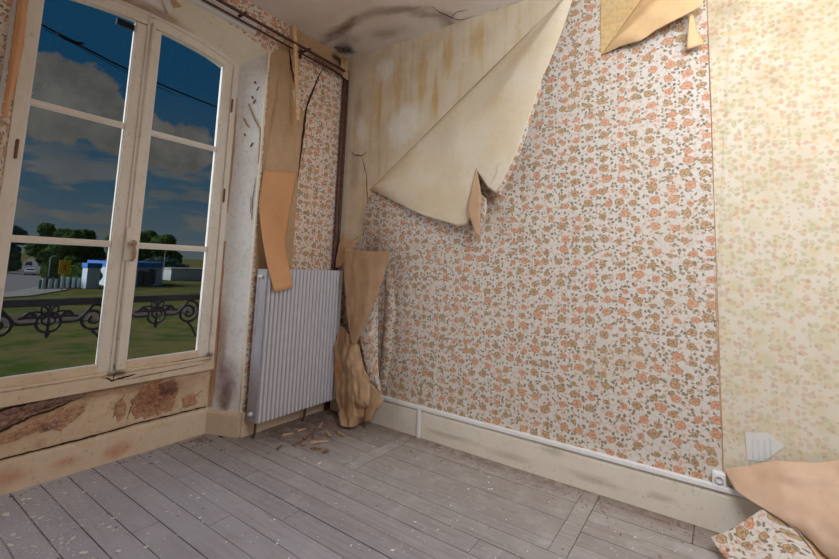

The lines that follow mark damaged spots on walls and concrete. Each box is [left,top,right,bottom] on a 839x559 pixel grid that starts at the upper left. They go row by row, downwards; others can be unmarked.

peeling [600,0,641,55]
flaking render [261,0,560,269]
peeling [254,215,268,269]
peeling [706,0,839,487]
flaking render [0,392,89,444]